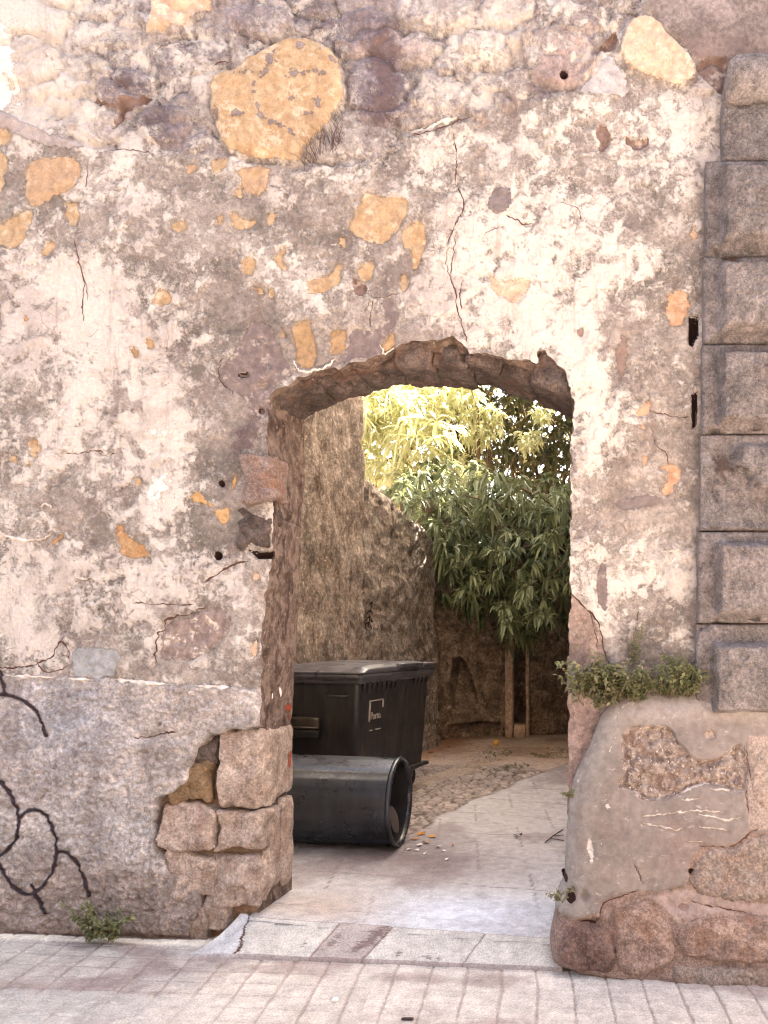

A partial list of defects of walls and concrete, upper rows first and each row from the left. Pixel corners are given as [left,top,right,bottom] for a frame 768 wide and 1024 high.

peeling [0,156,82,250]
crack [74,241,88,321]
peeling [338,193,427,292]
crack [412,118,467,341]
peeling [665,290,690,328]
spalling [220,299,399,419]
peeling [641,455,681,496]
crack [649,410,688,464]
peeling [116,523,148,559]
crack [0,641,70,673]
crack [134,561,248,664]
crack [572,594,609,663]